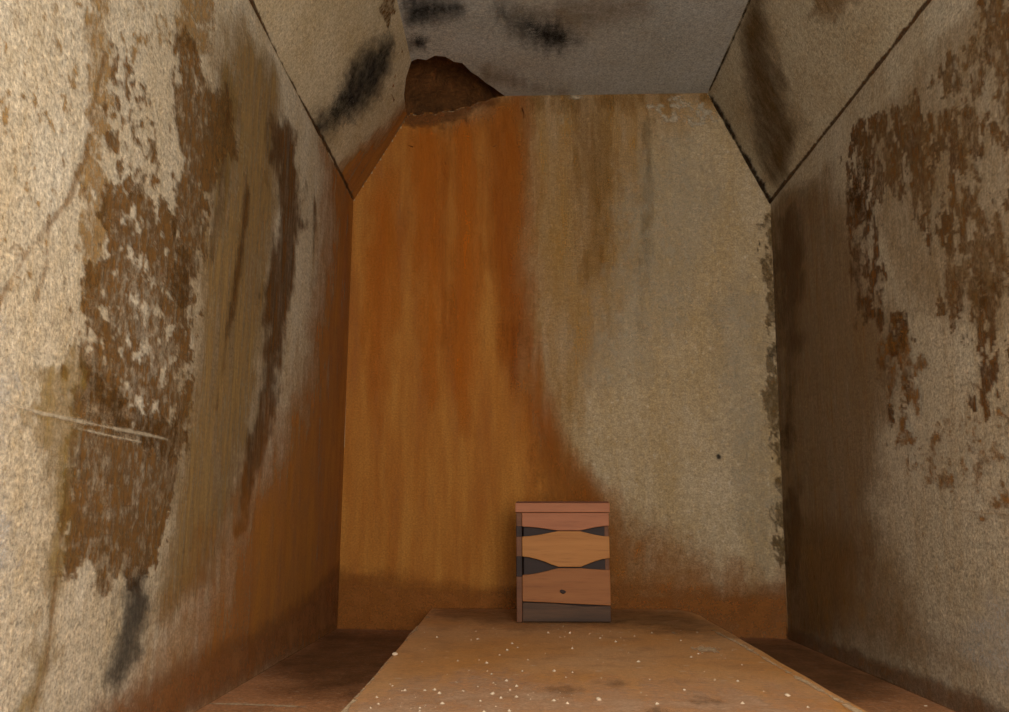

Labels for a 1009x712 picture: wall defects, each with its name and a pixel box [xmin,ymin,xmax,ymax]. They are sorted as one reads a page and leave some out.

water stain [408,0,462,22]
water stain [317,41,393,131]
spalling [392,56,504,117]
water stain [160,29,316,619]
corrosion [172,104,596,677]
corrosion [609,526,740,600]
water stain [109,580,148,685]